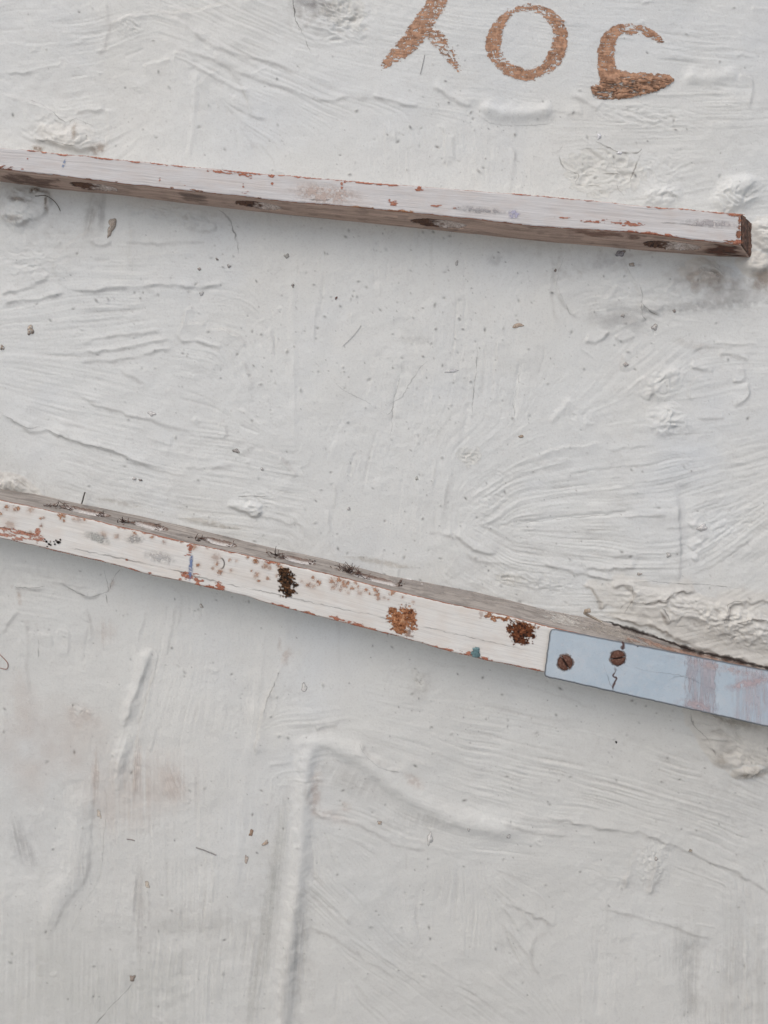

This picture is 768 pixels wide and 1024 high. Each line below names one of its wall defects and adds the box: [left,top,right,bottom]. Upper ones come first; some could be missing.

peeling [0,527,154,576]
corrosion [247,556,418,636]
corrosion [484,612,540,645]